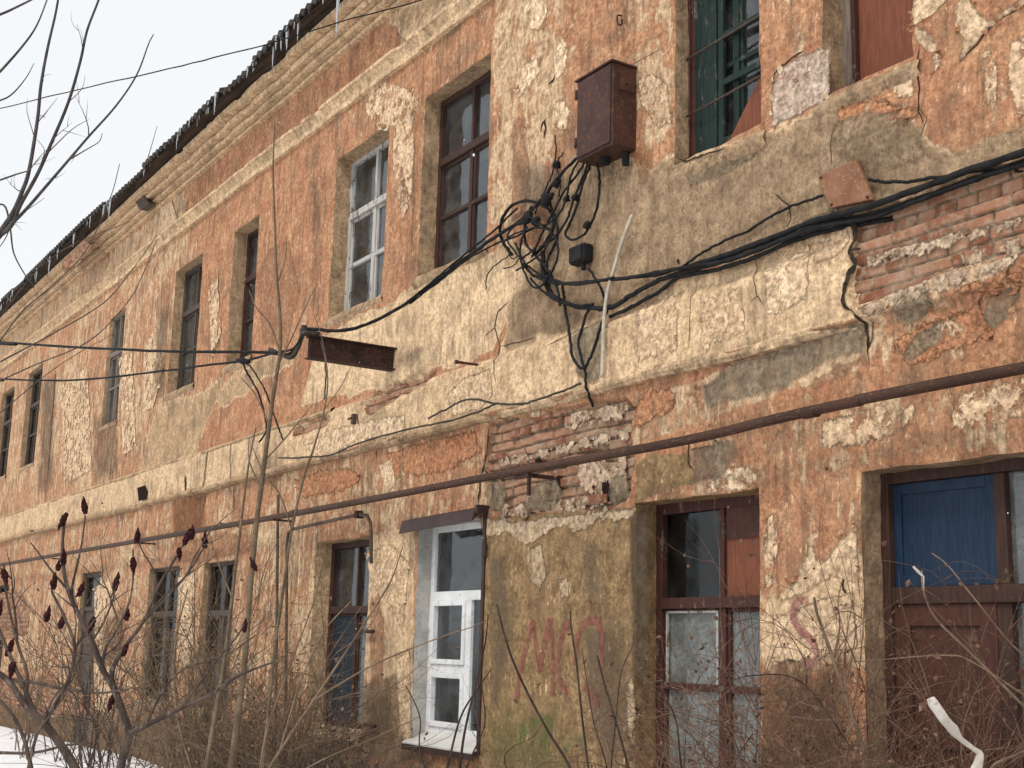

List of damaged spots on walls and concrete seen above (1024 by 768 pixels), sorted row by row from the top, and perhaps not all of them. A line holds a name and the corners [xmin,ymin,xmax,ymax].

peeling [363,81,419,219]
peeling [768,46,830,127]
crack [917,44,927,136]
peeling [907,0,1024,117]
crack [840,215,873,365]
spalling [763,167,1024,366]
spalling [379,385,676,598]
damp [704,324,865,407]
peeling [819,396,924,449]
peeling [949,376,1024,430]
damp [631,515,647,677]
peeling [771,522,860,661]